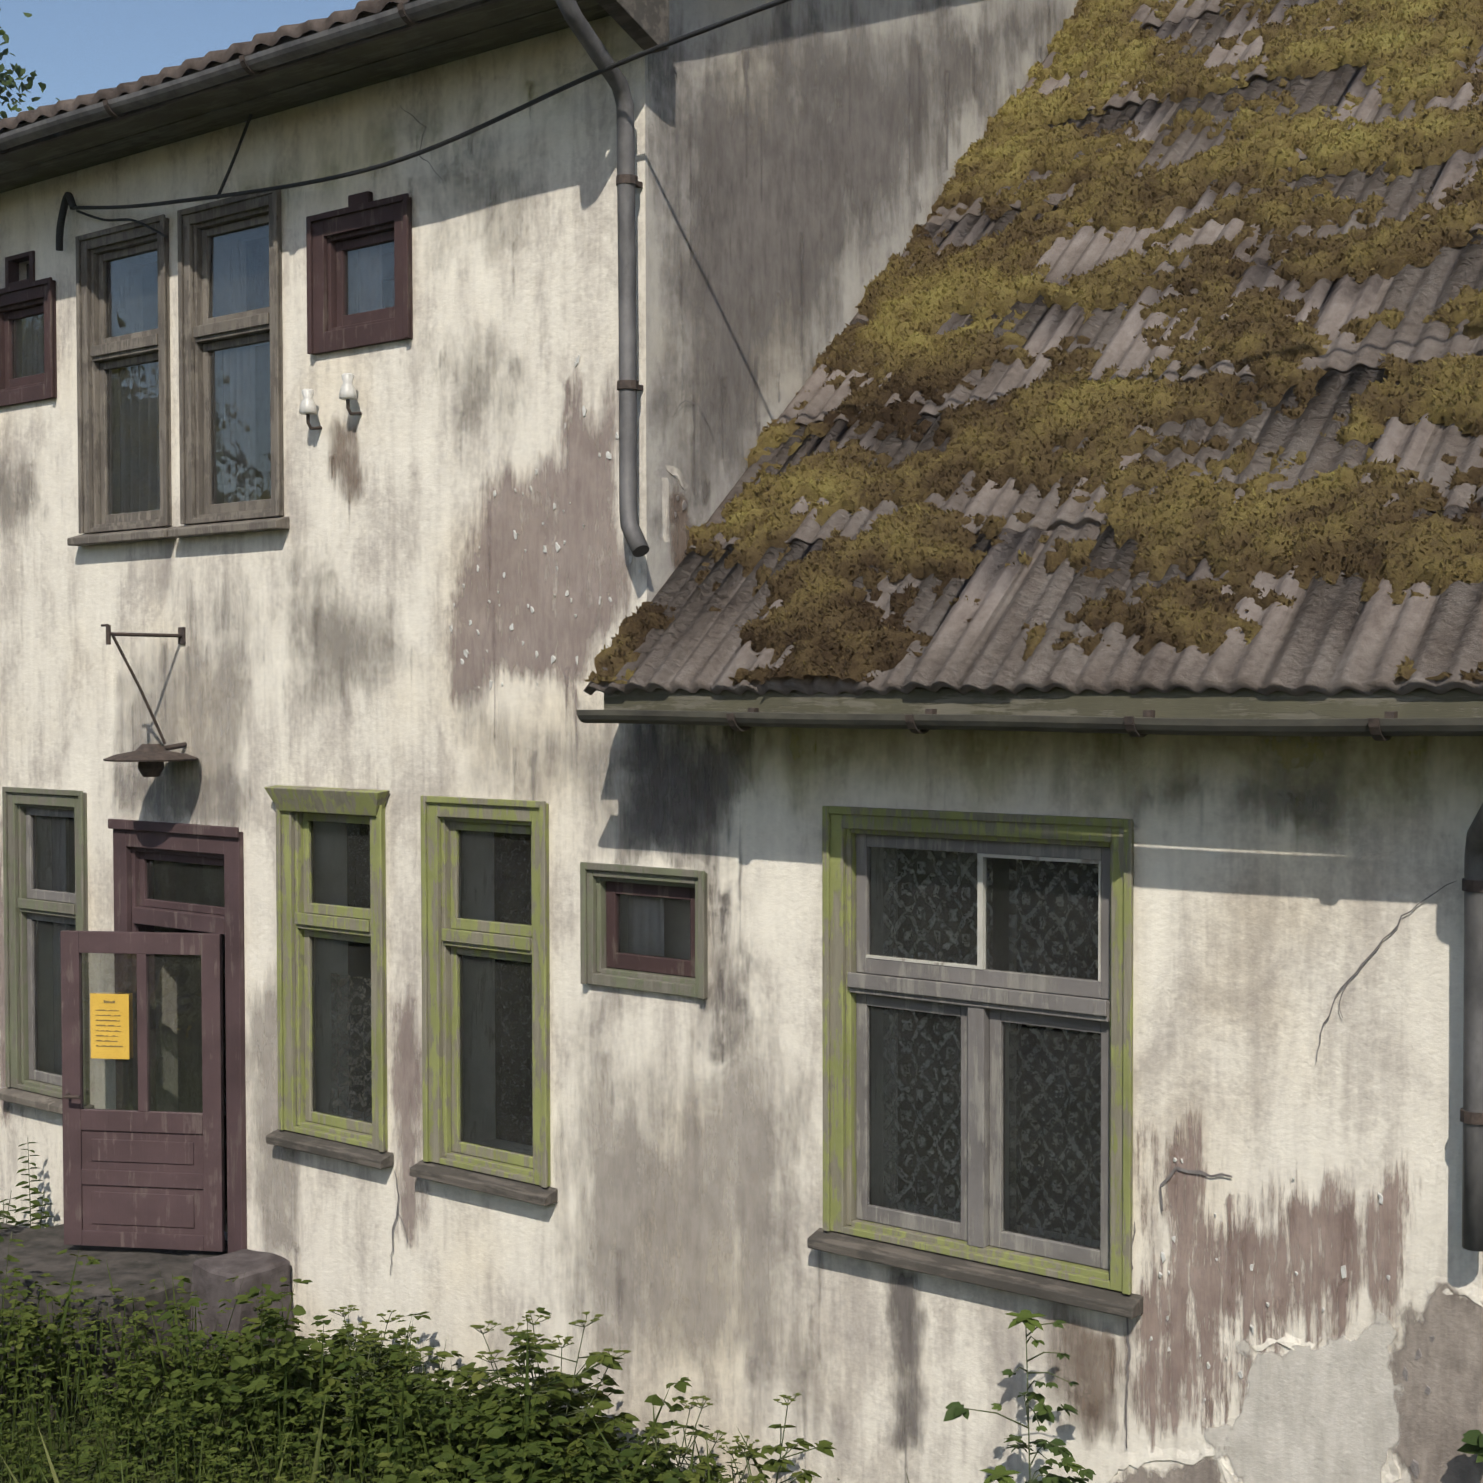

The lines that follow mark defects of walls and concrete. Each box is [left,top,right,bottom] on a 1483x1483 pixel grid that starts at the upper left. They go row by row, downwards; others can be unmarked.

leakage [663,0,1063,503]
leakage [572,724,752,855]
crack [1316,881,1456,1061]
peeling [1093,1113,1483,1483]